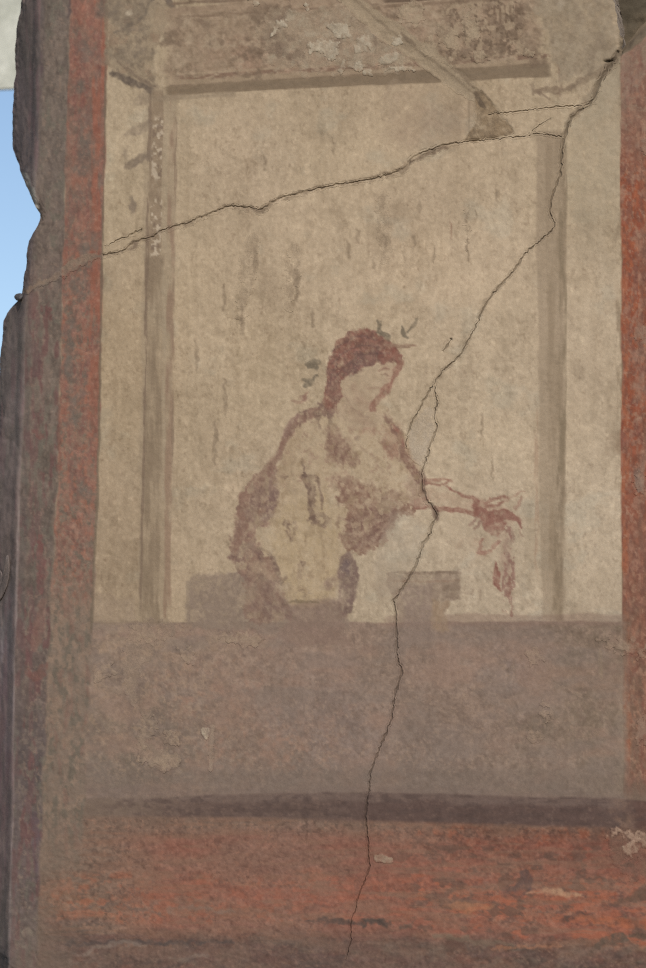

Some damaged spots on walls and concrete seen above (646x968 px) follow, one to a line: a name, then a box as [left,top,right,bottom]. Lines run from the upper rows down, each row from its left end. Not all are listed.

peeling [253,0,426,79]
crack [22,117,564,295]
crack [344,47,624,961]
peeling [604,823,646,885]